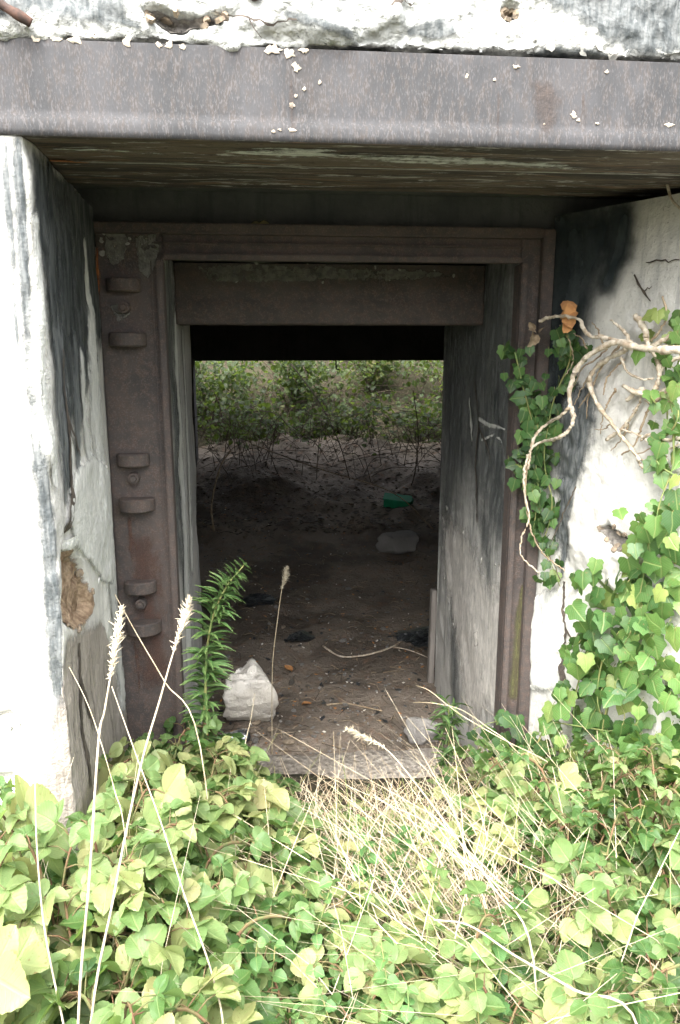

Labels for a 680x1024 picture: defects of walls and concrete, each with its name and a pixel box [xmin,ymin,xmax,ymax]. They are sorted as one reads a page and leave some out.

peeling [50,33,96,44]
spalling [144,8,229,50]
water stain [226,148,581,170]
water stain [553,207,632,352]
water stain [552,347,596,578]
water stain [2,136,128,851]
flaking render [60,455,115,633]
spalling [597,524,628,553]
rust [134,636,164,688]